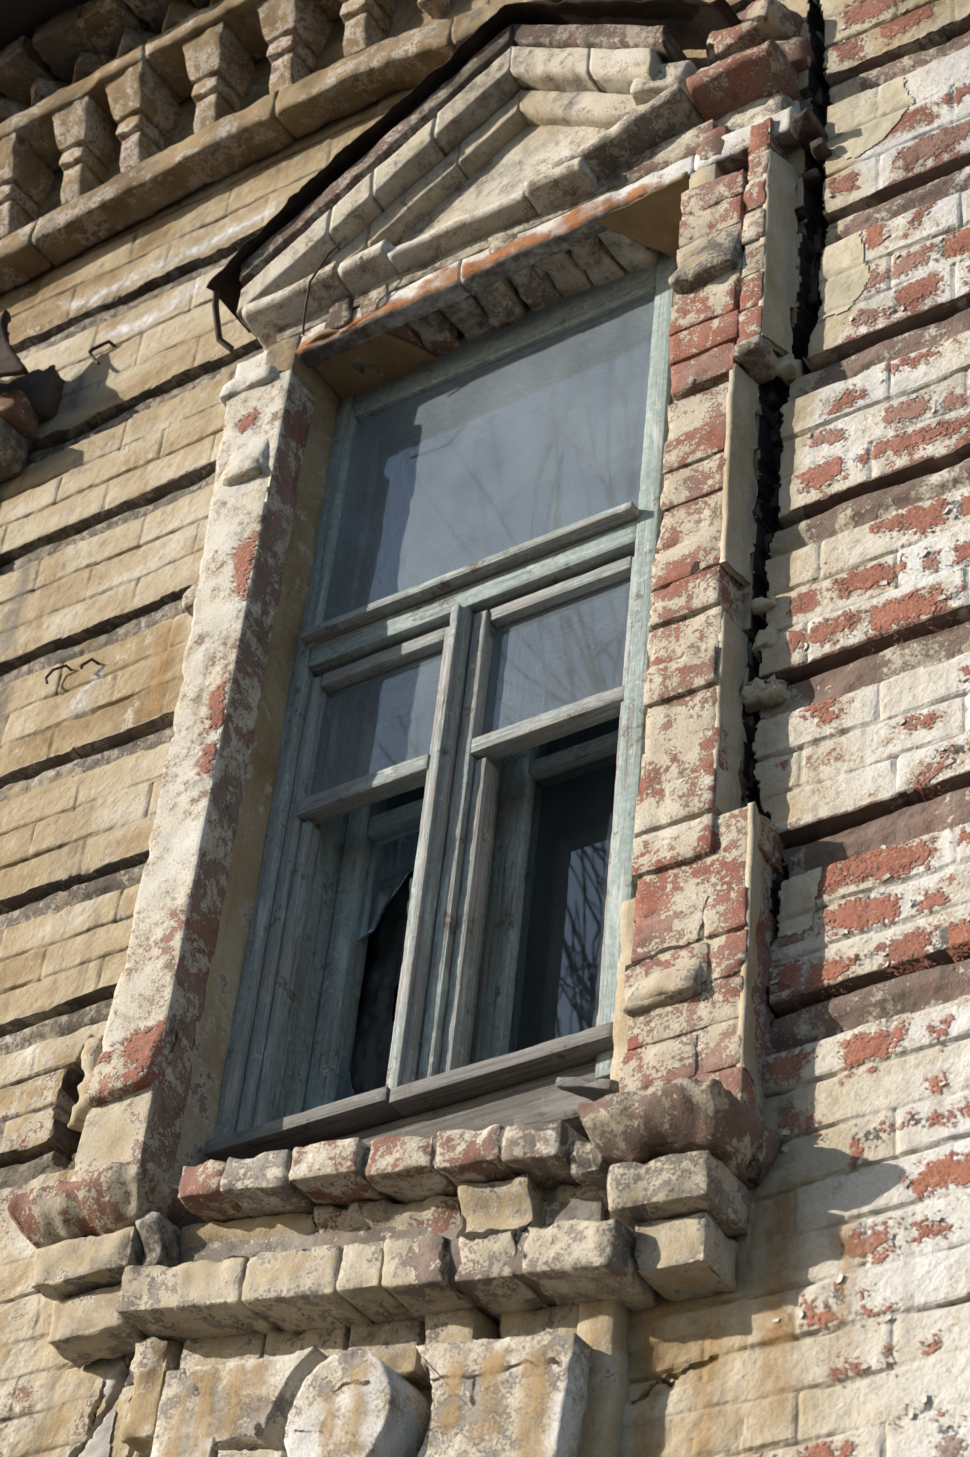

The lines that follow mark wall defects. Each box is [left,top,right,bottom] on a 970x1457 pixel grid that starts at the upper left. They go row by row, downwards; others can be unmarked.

peeling [830,0,937,65]
peeling [894,82,970,173]
peeling [842,197,970,328]
crack [651,0,832,821]
peeling [786,340,970,500]
peeling [784,488,970,657]
peeling [888,708,945,739]
crack [765,857,789,1024]
peeling [770,825,970,1009]
spalling [49,1119,82,1161]
peeling [61,1014,172,1104]
peeling [761,1011,970,1176]